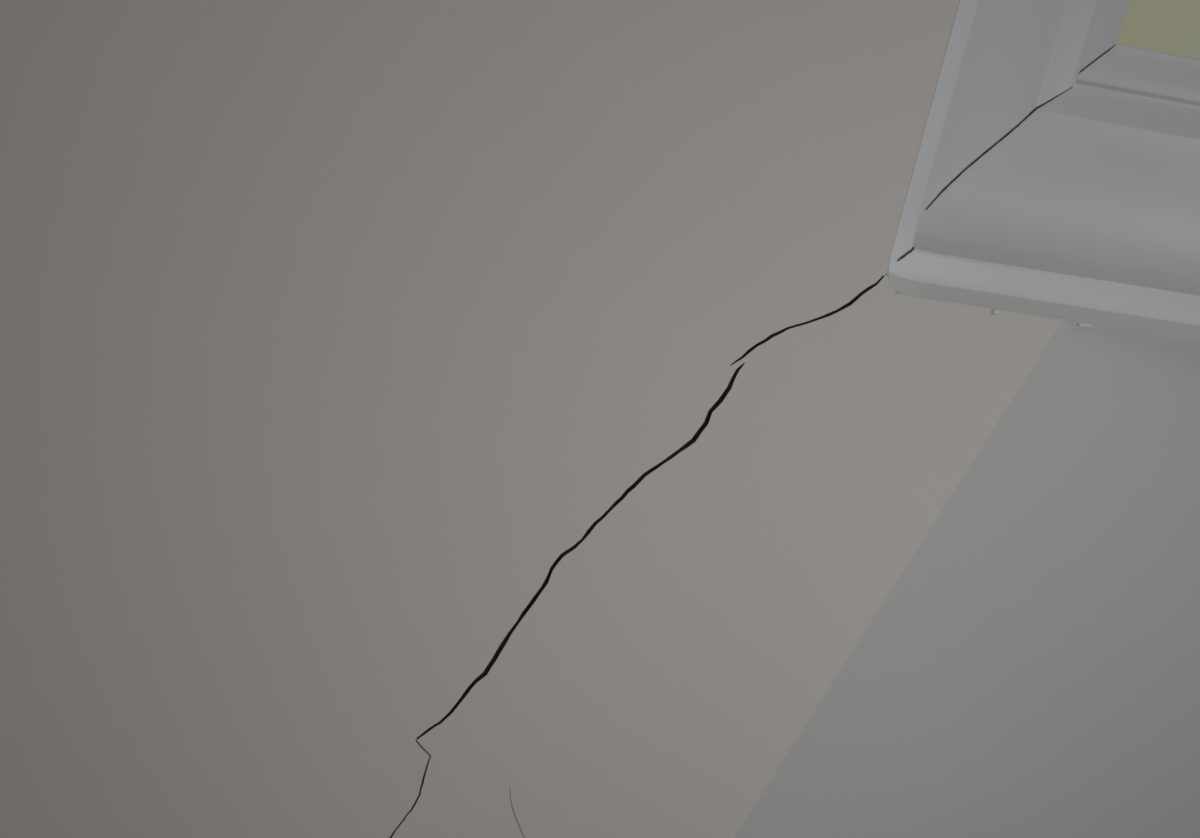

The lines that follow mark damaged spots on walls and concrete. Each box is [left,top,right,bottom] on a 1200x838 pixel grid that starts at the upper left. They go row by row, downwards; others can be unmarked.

crack [926,44,1116,210]
crack [389,247,914,838]